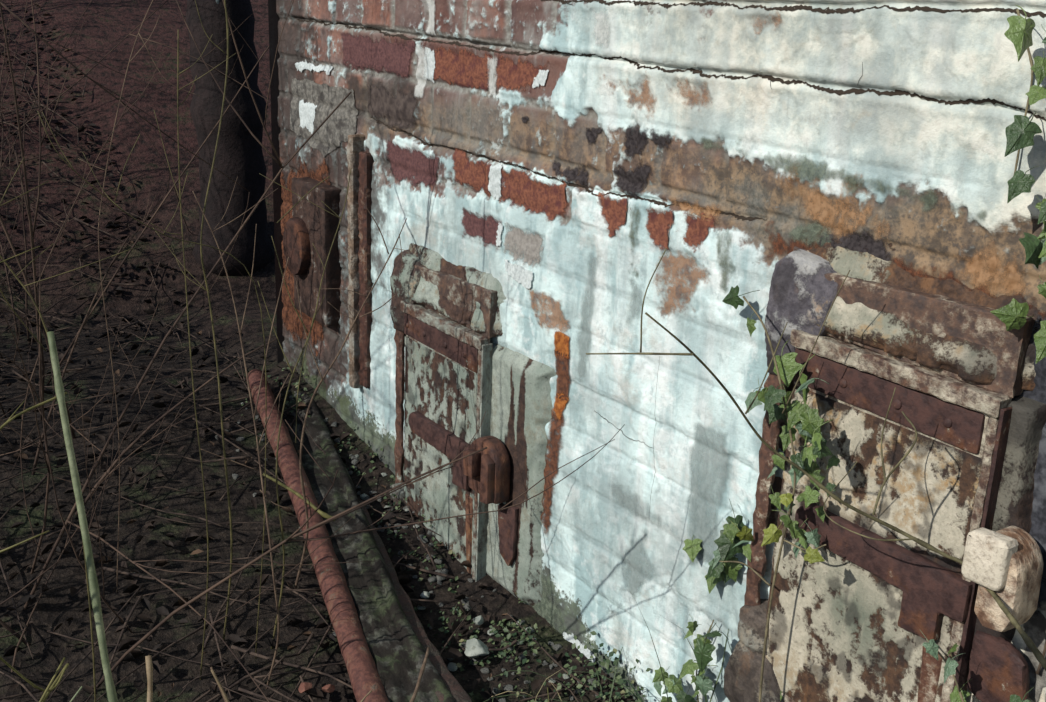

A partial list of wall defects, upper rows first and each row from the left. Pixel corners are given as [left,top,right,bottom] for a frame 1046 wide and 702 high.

crack [541,0,1046,18]
flaking render [290,33,549,157]
crack [294,17,1046,121]
peeling [452,148,567,221]
flaking render [462,207,570,331]
crack [371,117,767,221]
peeling [596,191,628,237]
peeling [646,208,715,315]
rust [767,224,820,255]
rust [788,167,870,243]
rust [893,250,1024,296]
rust [540,331,570,533]